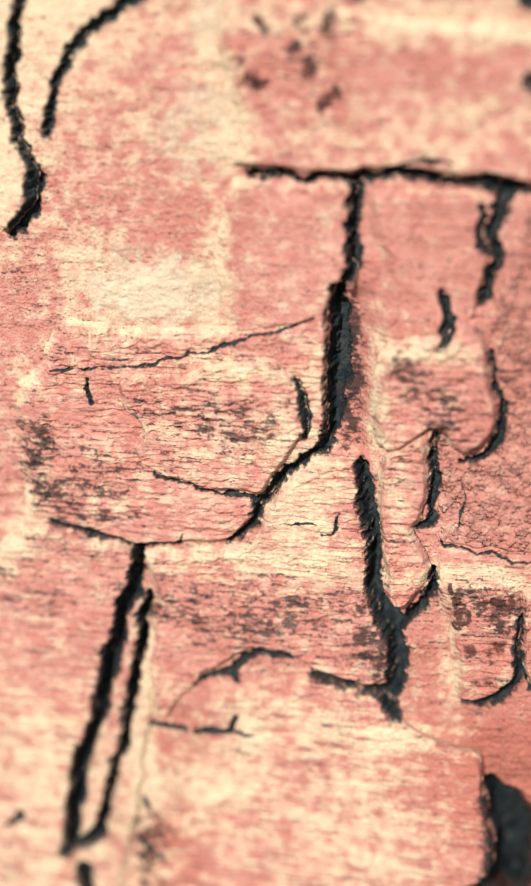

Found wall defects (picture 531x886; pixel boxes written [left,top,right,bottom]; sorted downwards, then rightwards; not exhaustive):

peeling [0,0,41,230]
crack [0,0,148,240]
crack [50,518,253,886]
peeling [0,173,496,886]
crack [49,158,531,544]
crack [193,349,531,724]
spalling [368,187,531,700]